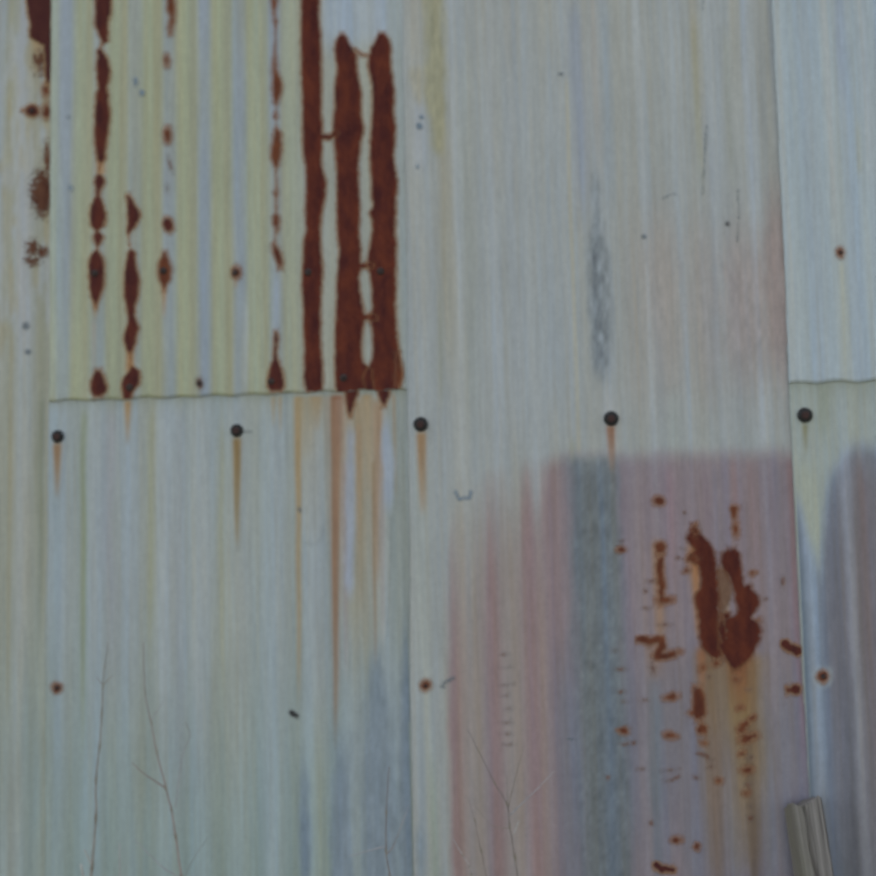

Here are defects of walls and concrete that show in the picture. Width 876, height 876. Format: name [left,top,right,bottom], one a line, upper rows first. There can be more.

rust [21,0,51,118]
rust [166,0,176,35]
rust [163,126,172,144]
rust [23,237,49,268]
rust [27,137,50,222]
rust [87,0,112,398]
rust [121,194,141,447]
rust [157,250,172,320]
rust [162,216,174,233]
rust [267,0,404,749]
rust [730,505,741,537]
rust [635,522,802,876]